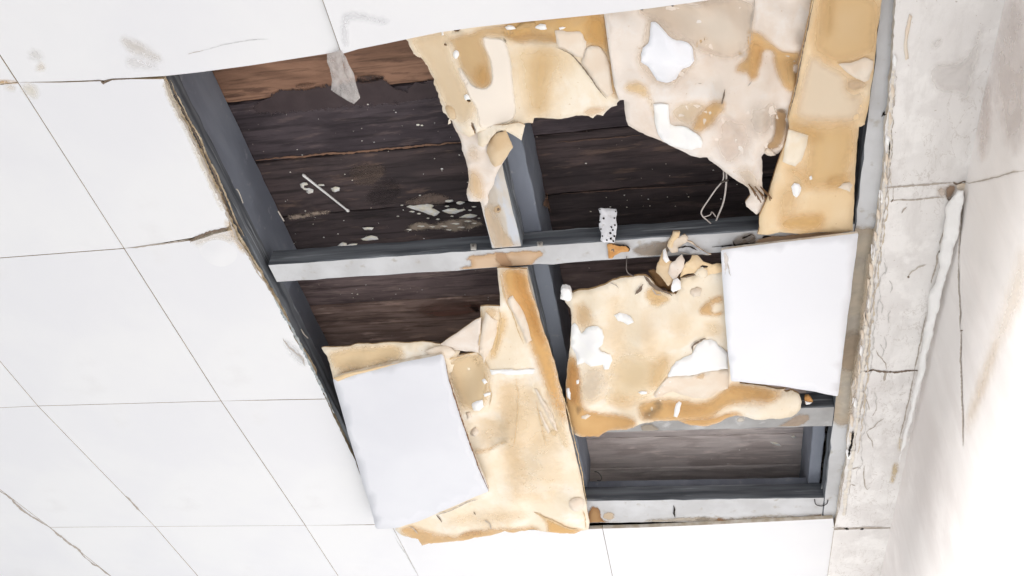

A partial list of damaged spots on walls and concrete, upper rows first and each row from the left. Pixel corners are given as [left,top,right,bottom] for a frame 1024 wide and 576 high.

water stain [254,14,606,119]
peeling [453,21,613,128]
peeling [640,21,694,83]
peeling [653,103,703,150]
water stain [642,0,798,91]
peeling [397,195,482,231]
water stain [424,304,504,409]
peeling [571,323,612,370]
water stain [463,206,776,437]
crack [851,317,926,490]
crack [885,171,1021,439]
water stain [403,521,580,545]